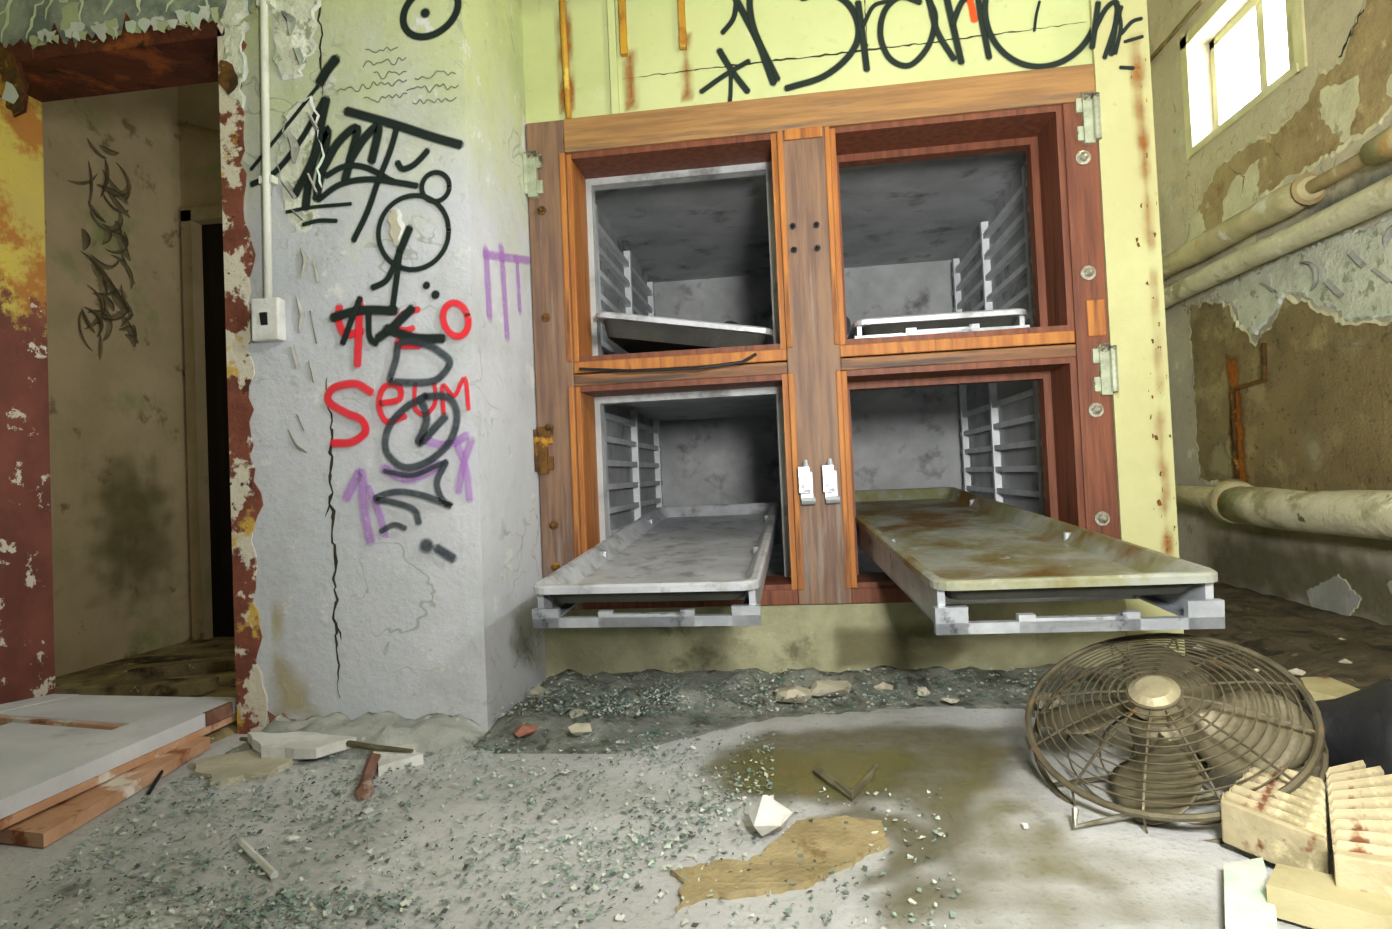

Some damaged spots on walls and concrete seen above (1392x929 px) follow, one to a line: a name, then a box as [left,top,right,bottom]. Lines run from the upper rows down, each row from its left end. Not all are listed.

peeling [0,0,321,109]
crack [1338,9,1364,58]
spalling [1185,0,1392,242]
peeling [67,138,139,359]
peeling [276,95,325,282]
peeling [290,295,318,383]
peeling [287,414,307,453]
corrosion [1226,357,1248,483]
crack [325,378,341,698]